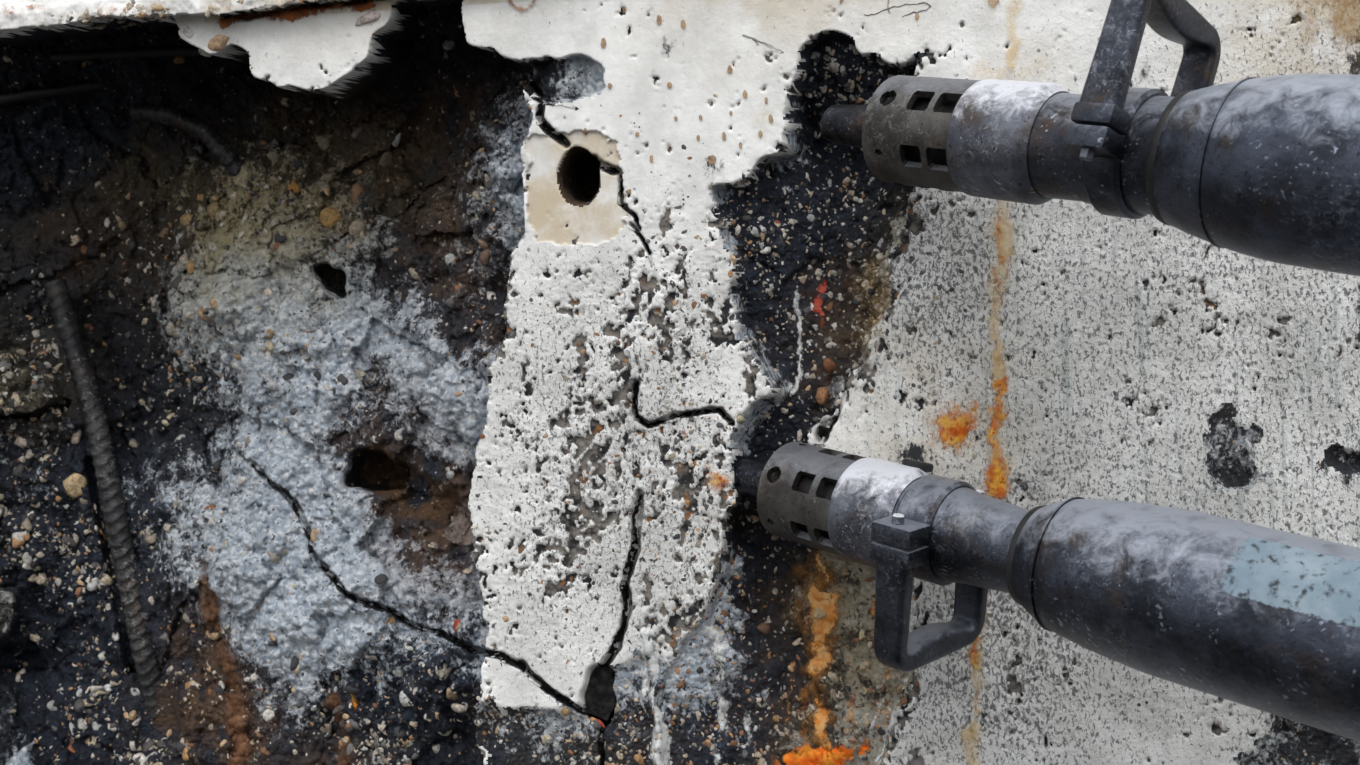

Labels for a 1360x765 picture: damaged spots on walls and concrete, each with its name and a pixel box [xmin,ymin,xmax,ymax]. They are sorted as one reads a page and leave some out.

corrosion [211,0,376,29]
crack [523,80,652,265]
spalling [0,0,926,765]
crack [632,380,734,436]
corrosion [935,312,1008,499]
spalling [1202,403,1268,493]
corrosion [198,561,254,765]
crack [234,448,642,765]
corrosion [776,551,870,765]
spalling [1233,714,1360,765]